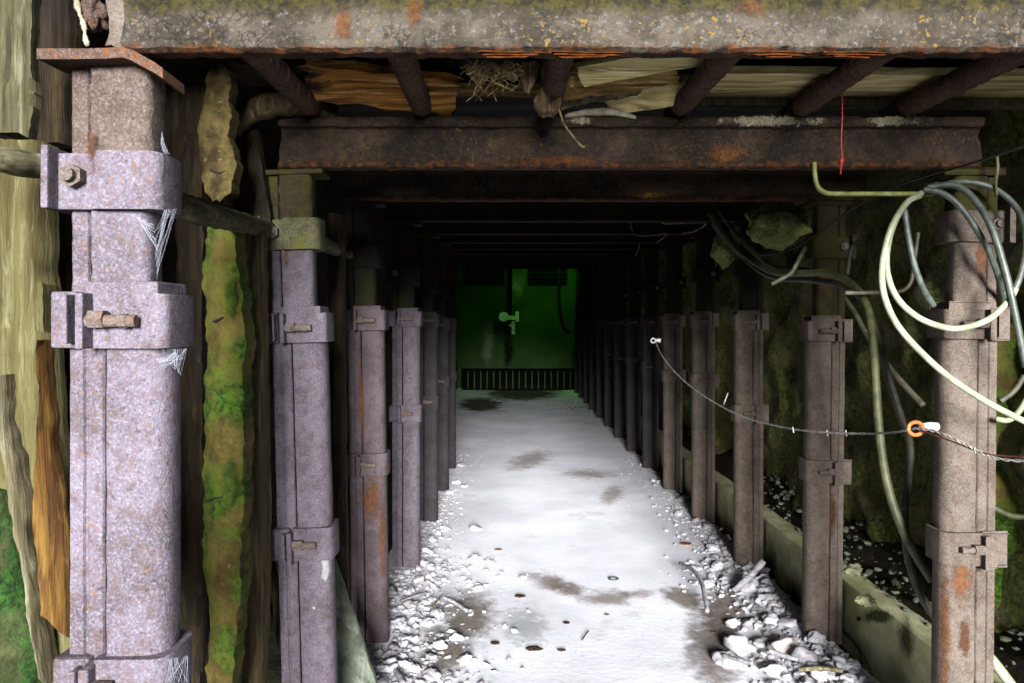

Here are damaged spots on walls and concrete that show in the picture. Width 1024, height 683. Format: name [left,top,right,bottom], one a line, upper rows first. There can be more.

rust [747,51,891,59]
rust [363,476,386,576]
water stain [532,575,628,604]
rust [939,566,971,683]